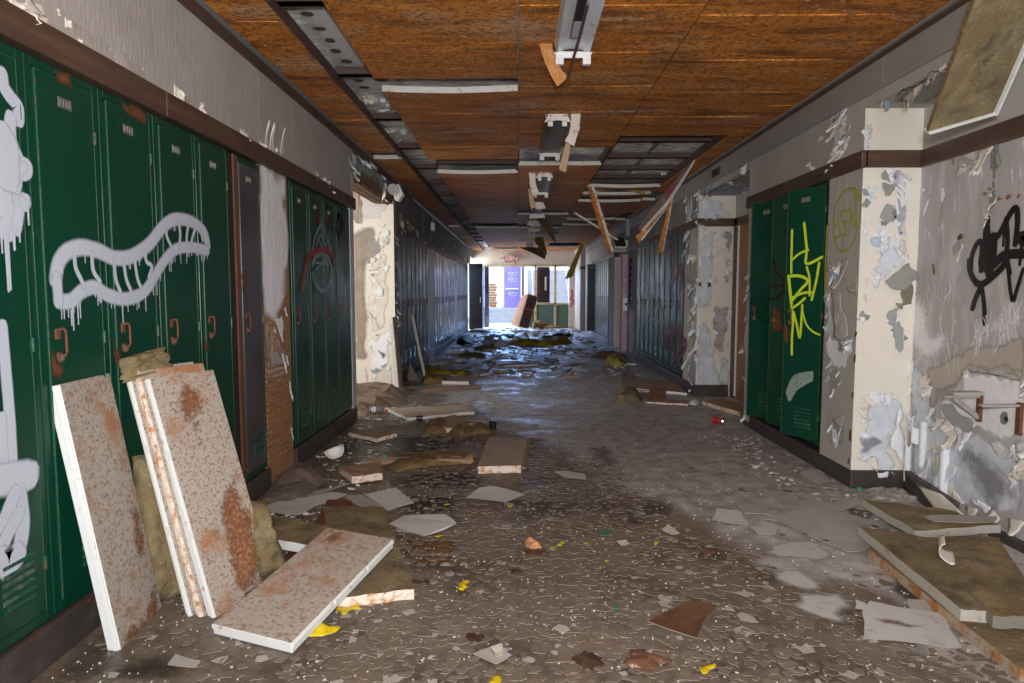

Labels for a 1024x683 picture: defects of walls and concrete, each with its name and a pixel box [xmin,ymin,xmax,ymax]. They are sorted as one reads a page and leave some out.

corrosion [57,73,71,87]
corrosion [122,104,146,123]
peeling [260,165,294,464]
spalling [349,153,426,379]
peeling [597,143,702,175]
peeling [681,164,750,423]
peeling [805,108,873,173]
peeling [822,169,1024,536]